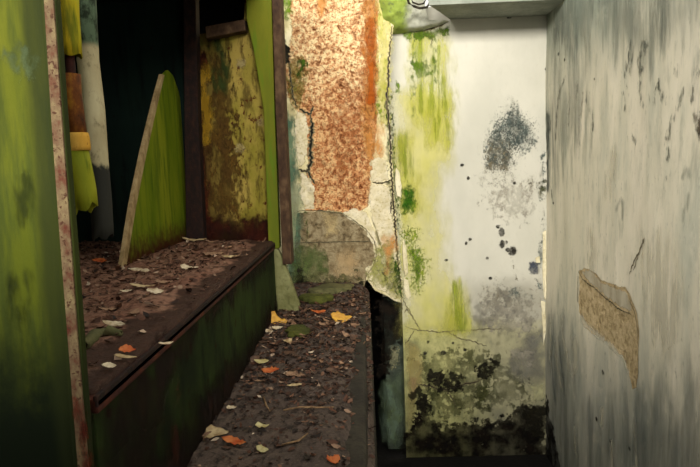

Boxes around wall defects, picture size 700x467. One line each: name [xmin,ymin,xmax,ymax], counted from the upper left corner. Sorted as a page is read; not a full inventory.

rust [200,39,274,323]
crack [288,63,315,184]
spalling [286,0,411,299]
damp [419,39,440,108]
crack [373,27,499,346]
damp [483,103,557,255]
rust [153,339,252,467]
damp [399,278,560,467]
damp [529,240,543,289]
peeling [535,230,547,345]
spalling [577,268,639,389]